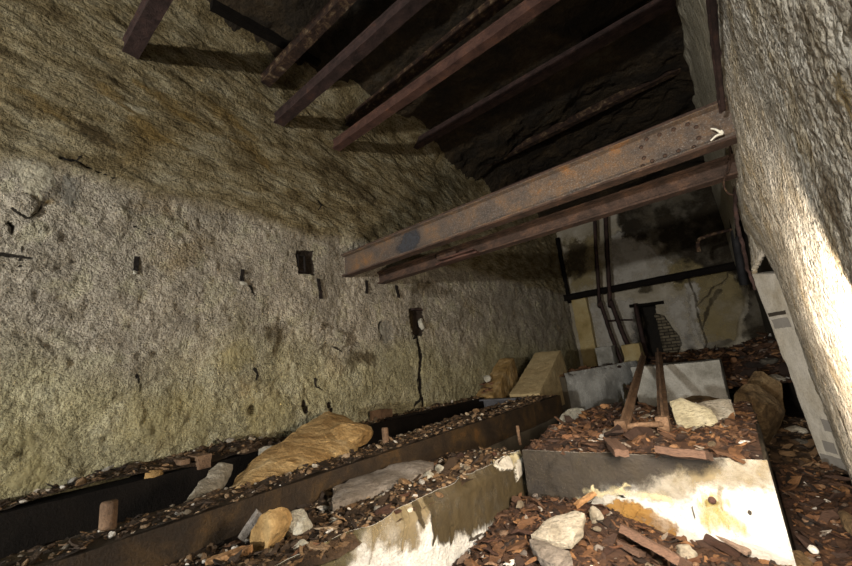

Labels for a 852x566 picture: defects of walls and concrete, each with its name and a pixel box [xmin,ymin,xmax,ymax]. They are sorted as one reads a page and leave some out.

crack [59,155,115,179]
peeling [611,231,672,293]
peeling [590,298,636,349]
spalling [654,271,744,353]
crack [688,271,728,348]
crack [411,332,423,407]
leakage [347,450,770,561]